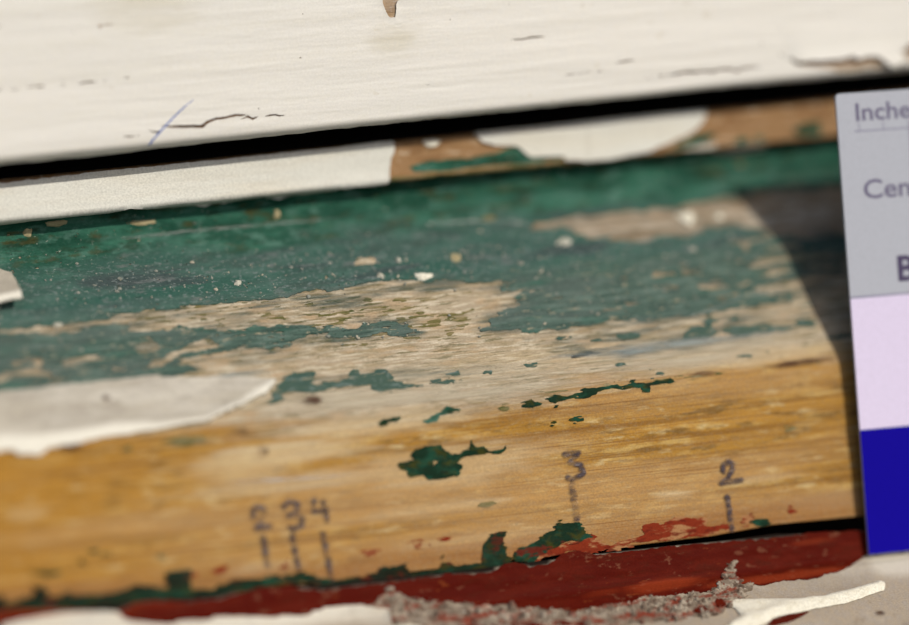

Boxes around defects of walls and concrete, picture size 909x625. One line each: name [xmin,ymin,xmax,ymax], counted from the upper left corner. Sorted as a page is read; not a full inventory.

peeling [383,0,398,18]
crack [648,66,759,78]
crack [123,114,285,137]
peeling [658,100,837,153]
peeling [390,135,570,181]
peeling [530,187,848,298]
peeling [0,248,522,456]
peeling [4,605,391,625]